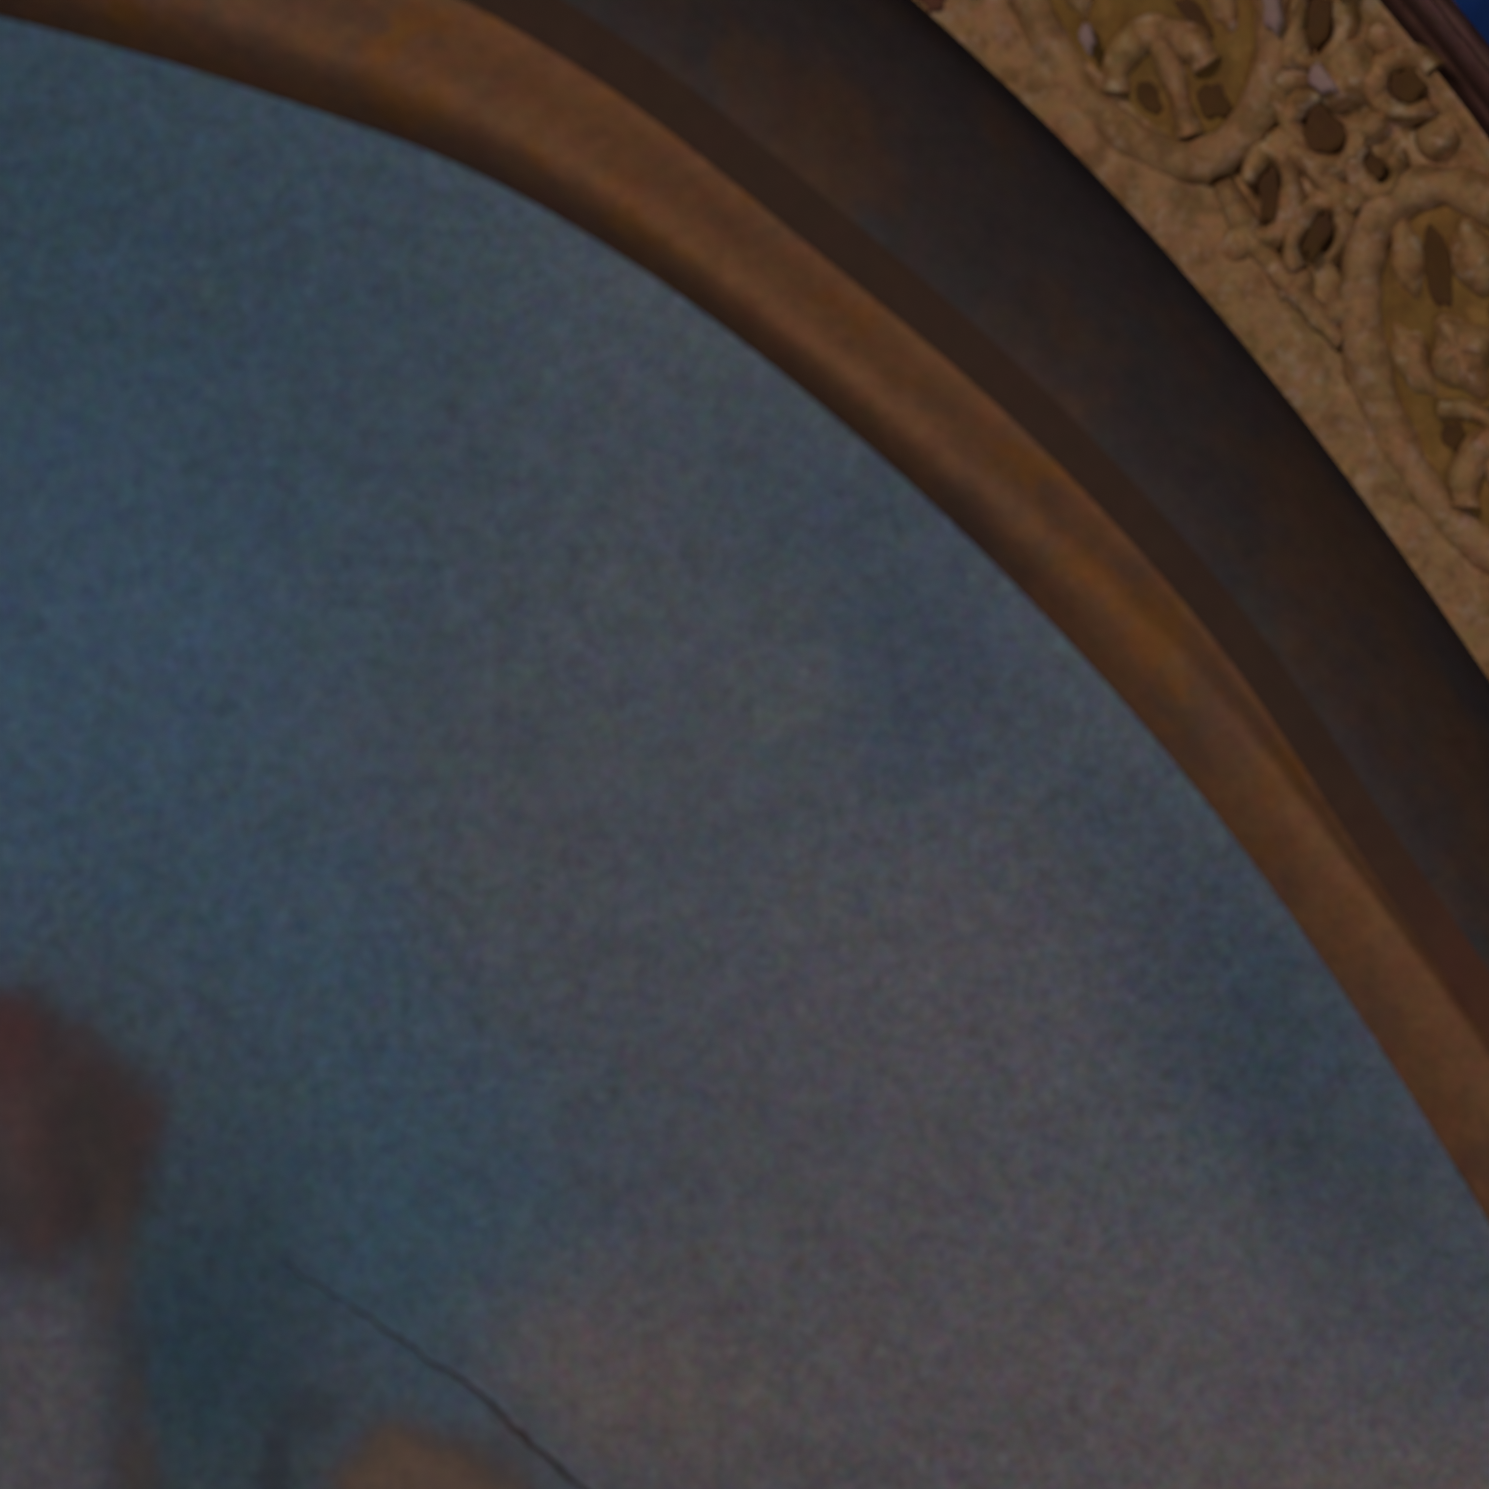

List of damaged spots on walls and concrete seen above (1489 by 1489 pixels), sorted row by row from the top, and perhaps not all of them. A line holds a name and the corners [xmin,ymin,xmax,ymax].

crack [283,1261,595,1489]